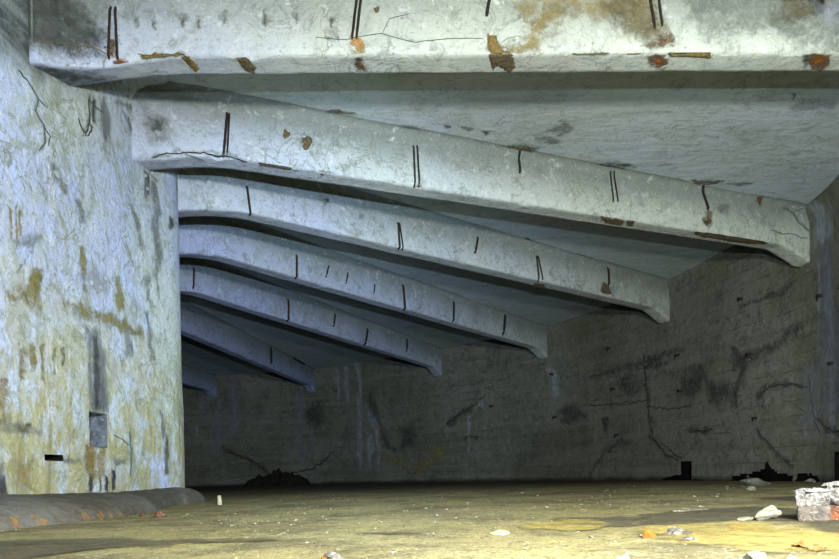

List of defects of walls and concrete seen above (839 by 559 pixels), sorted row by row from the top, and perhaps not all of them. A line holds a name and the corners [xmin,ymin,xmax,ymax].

water stain [28,0,108,56]
crack [316,13,483,43]
spalling [487,33,516,73]
rust [519,0,675,71]
rust [804,54,830,72]
crack [18,69,51,151]
water stain [145,182,162,299]
water stain [63,277,155,360]
water stain [89,331,107,410]
crack [590,349,691,461]
crack [756,379,839,436]
spalling [731,460,819,482]